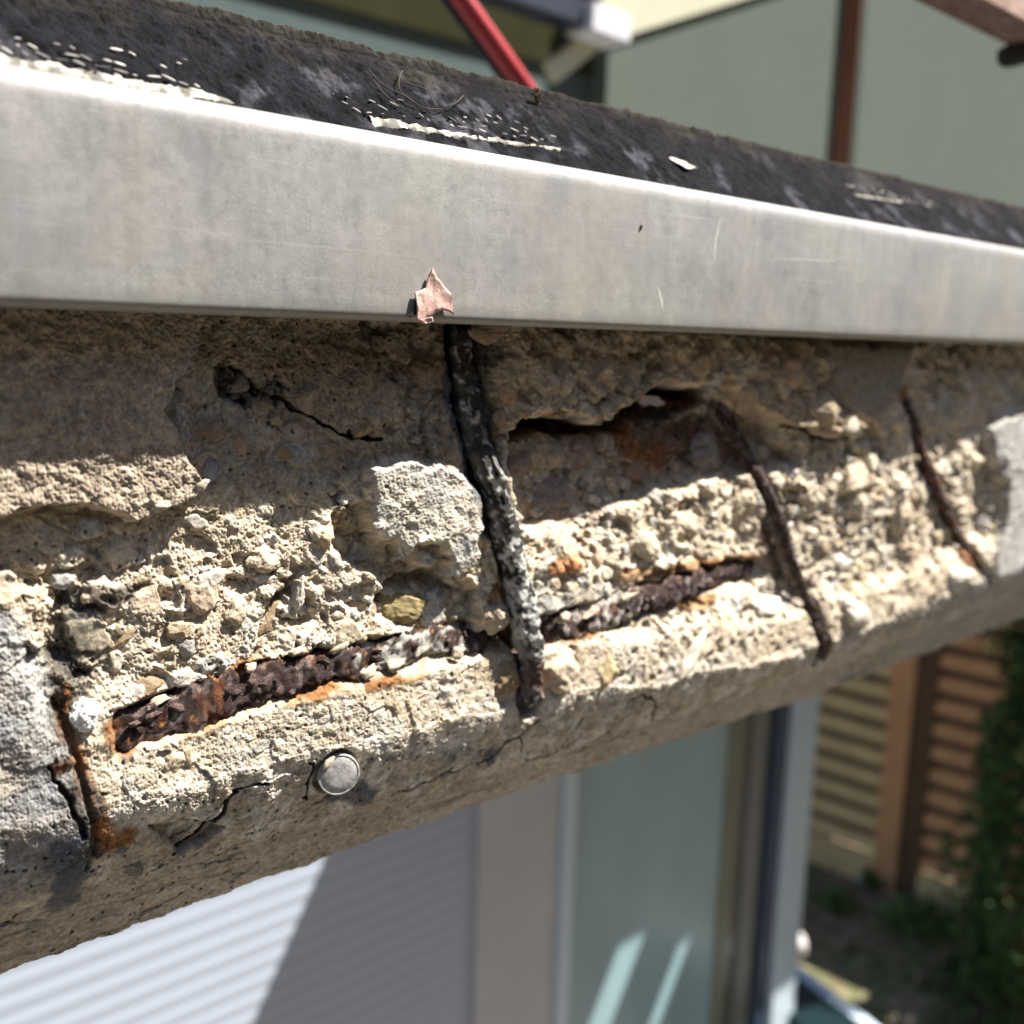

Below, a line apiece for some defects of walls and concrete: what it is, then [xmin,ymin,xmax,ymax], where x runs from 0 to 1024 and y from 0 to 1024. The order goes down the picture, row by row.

crack [237,370,383,442]
corrosion [911,437,978,574]
spalling [0,315,1024,810]
corrosion [622,522,785,581]
corrosion [137,688,176,702]
corrosion [216,653,308,678]
corrosion [291,679,345,702]
corrosion [47,683,137,853]
crack [303,762,317,799]
crack [391,717,583,796]
crack [172,782,270,856]
spalling [114,846,144,877]